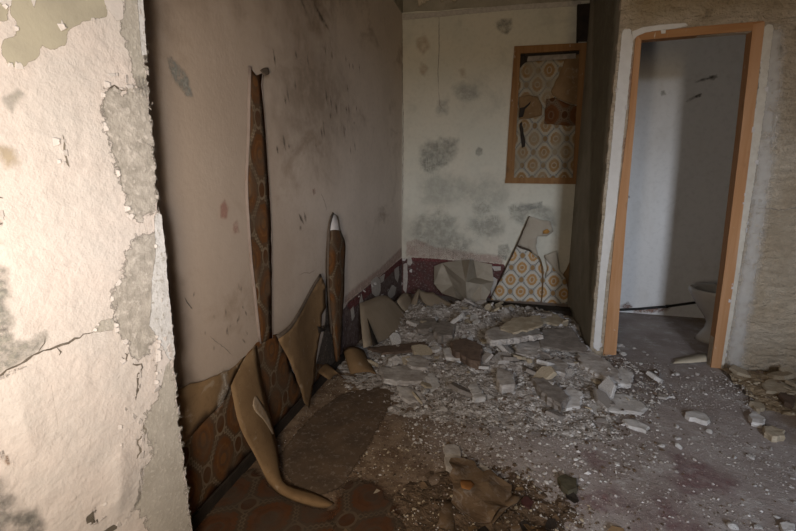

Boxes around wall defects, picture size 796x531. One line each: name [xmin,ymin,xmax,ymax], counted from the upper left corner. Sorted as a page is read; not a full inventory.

peeling [0,0,107,70]
peeling [52,137,70,168]
peeling [93,0,191,531]
water stain [0,270,39,370]
crack [0,332,93,376]
peeling [316,257,412,366]
water stain [0,502,35,530]
spalling [86,502,122,531]